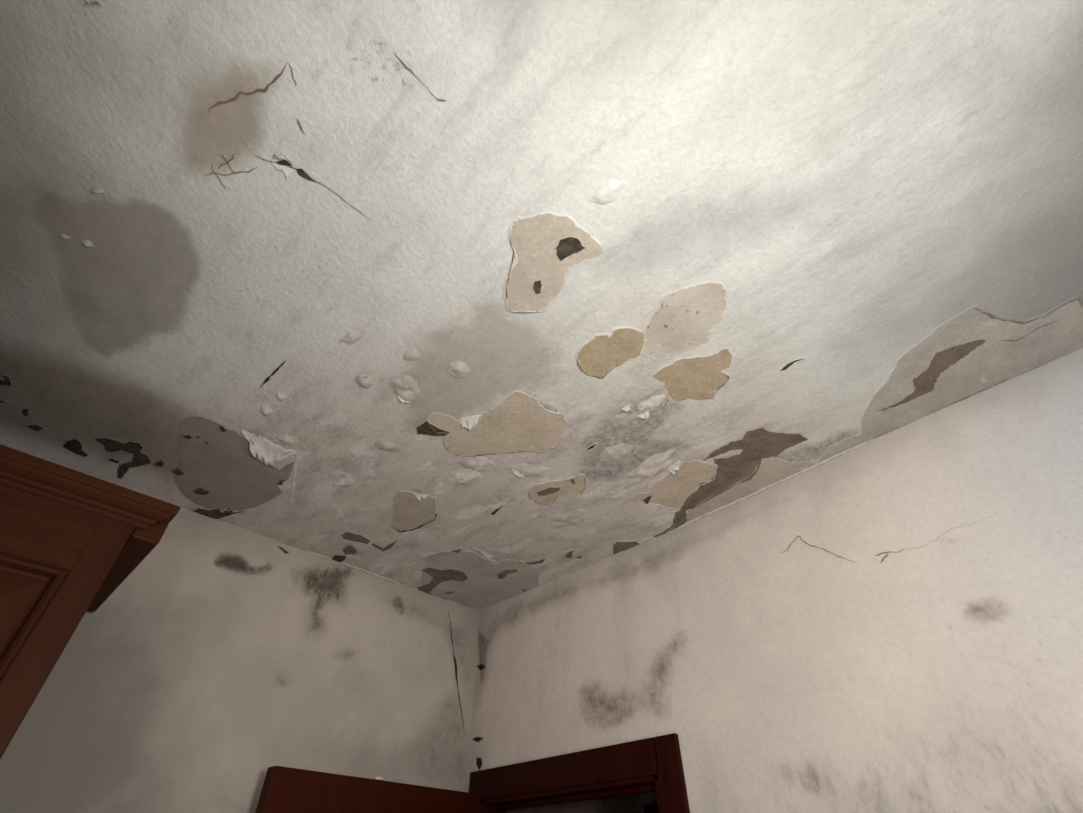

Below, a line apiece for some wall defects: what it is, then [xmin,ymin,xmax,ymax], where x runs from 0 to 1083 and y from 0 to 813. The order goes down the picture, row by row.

damp [195,80,250,158]
crack [208,63,296,115]
crack [209,142,363,215]
peeling [502,210,605,314]
peeling [575,280,734,419]
peeling [415,390,568,457]
peeling [611,295,1083,555]
peeling [62,417,298,520]
peeling [511,469,587,505]
peeling [331,489,438,562]
crack [781,515,994,563]
peeling [417,547,545,608]